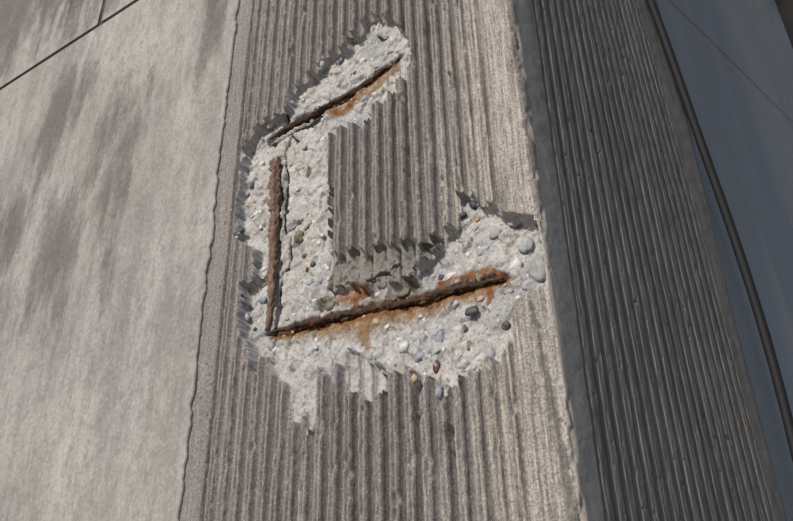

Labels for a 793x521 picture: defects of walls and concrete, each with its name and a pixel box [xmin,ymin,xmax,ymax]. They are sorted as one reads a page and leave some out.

rust [270,54,404,139]
crack [280,136,312,309]
rust [265,156,510,350]
spalling [232,11,548,435]
crack [366,242,436,282]